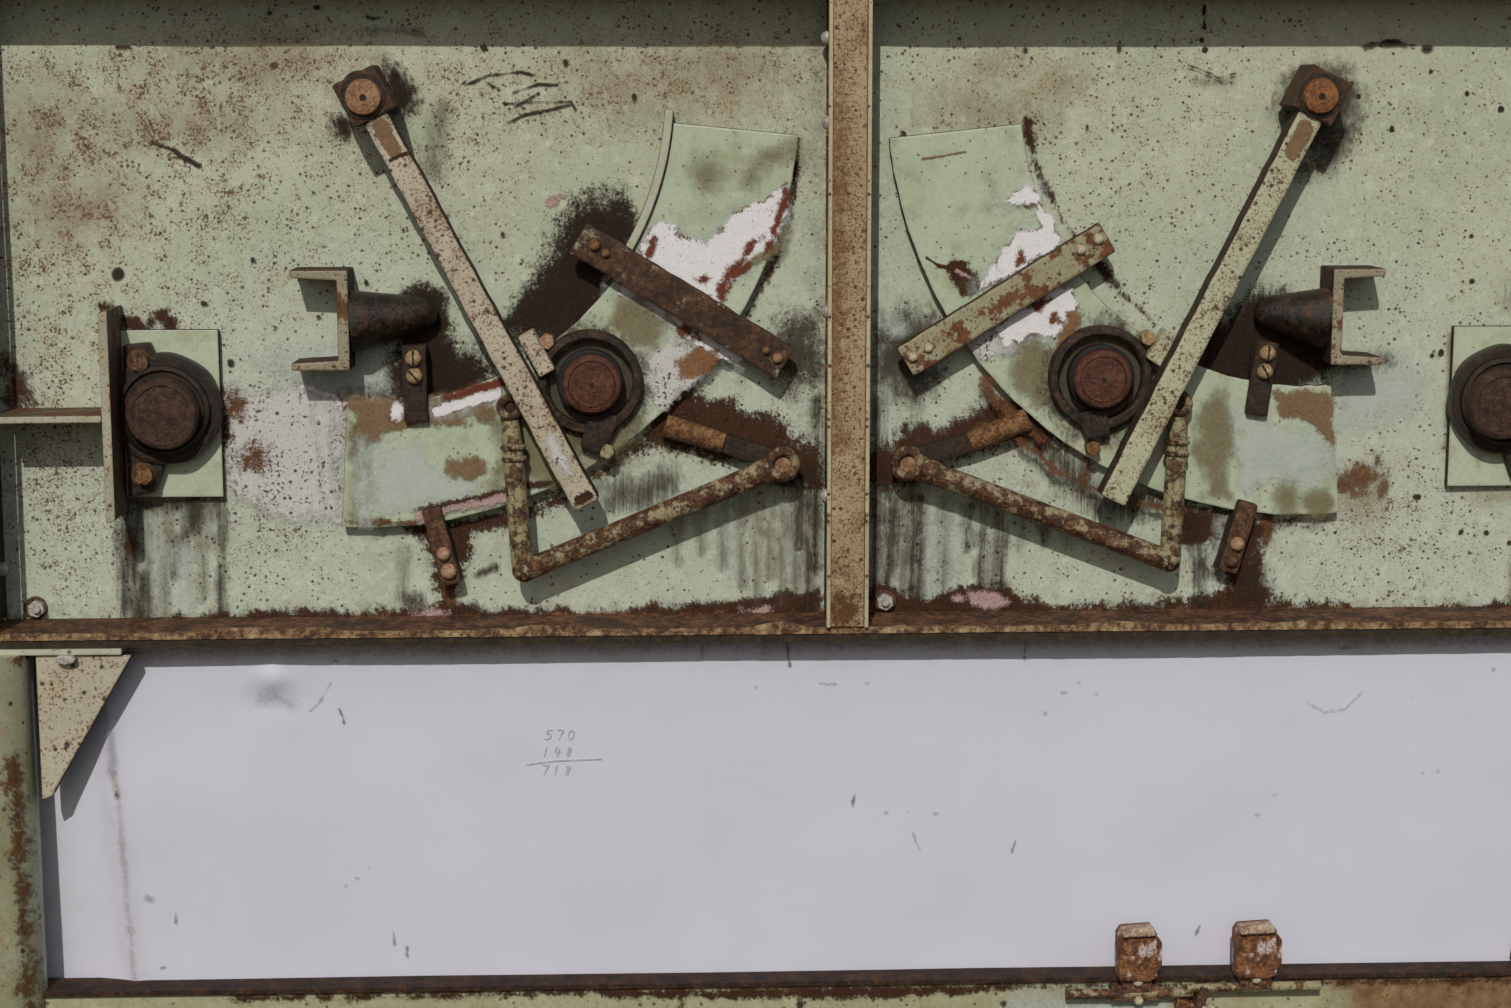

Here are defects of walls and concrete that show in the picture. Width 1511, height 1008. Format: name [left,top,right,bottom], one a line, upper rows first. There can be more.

peeling [637,182,792,304]
peeling [926,182,1061,297]
rust [1022,114,1075,237]
rust [529,68,862,550]
peeling [967,286,1083,361]
water stain [785,395,825,613]
rust [132,499,1511,646]
water stain [872,396,888,453]
water stain [869,478,1008,606]
rust [869,373,1163,522]
rust [0,747,46,1008]
rust [228,982,1109,1008]